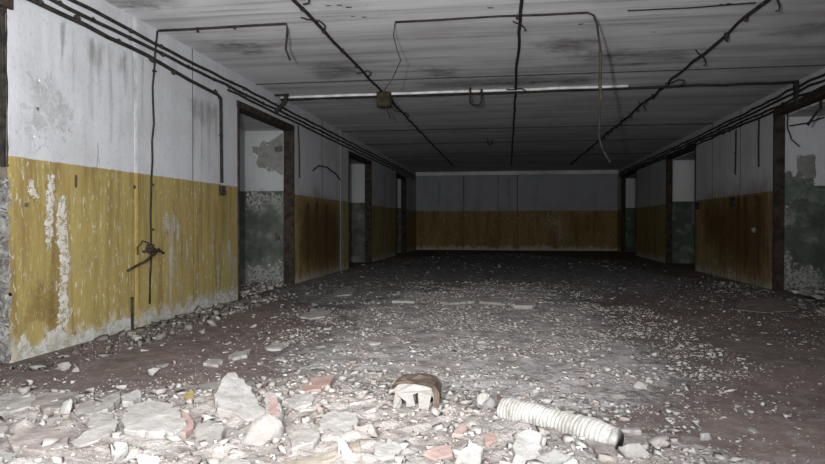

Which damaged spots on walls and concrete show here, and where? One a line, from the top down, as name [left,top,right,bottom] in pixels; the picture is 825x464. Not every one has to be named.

spalling [0,7,13,364]
peeling [24,174,72,333]
peeling [252,133,283,175]